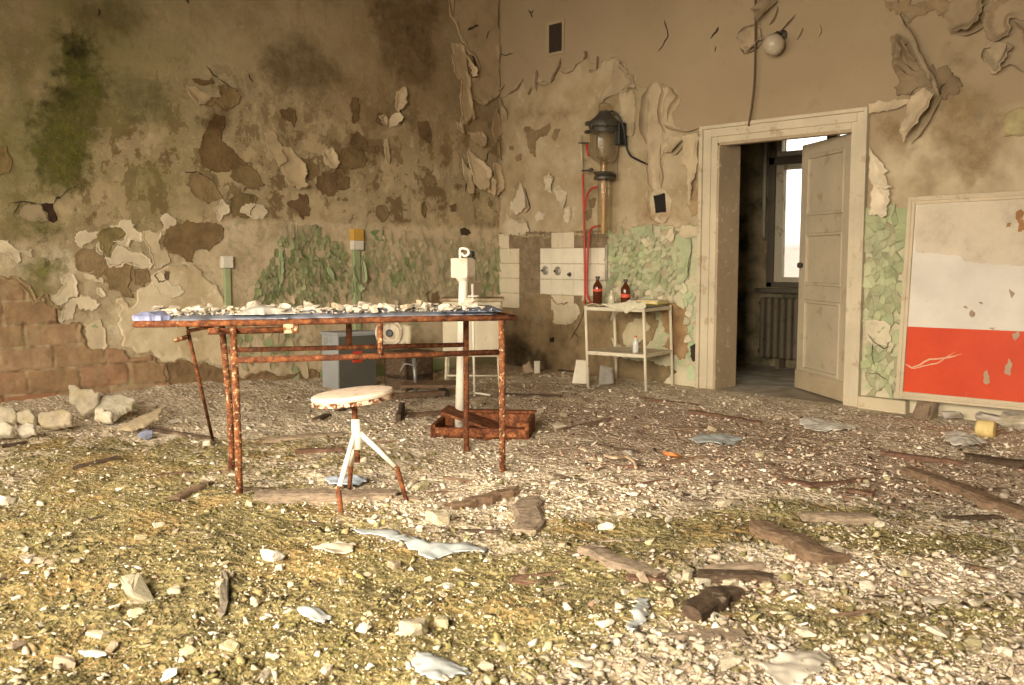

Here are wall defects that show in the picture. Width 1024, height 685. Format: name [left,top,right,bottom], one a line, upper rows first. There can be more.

mould [32,34,107,193]
flaking render [0,78,321,403]
peeling [253,0,699,383]
peeling [860,147,907,399]
peeling [868,0,1024,144]